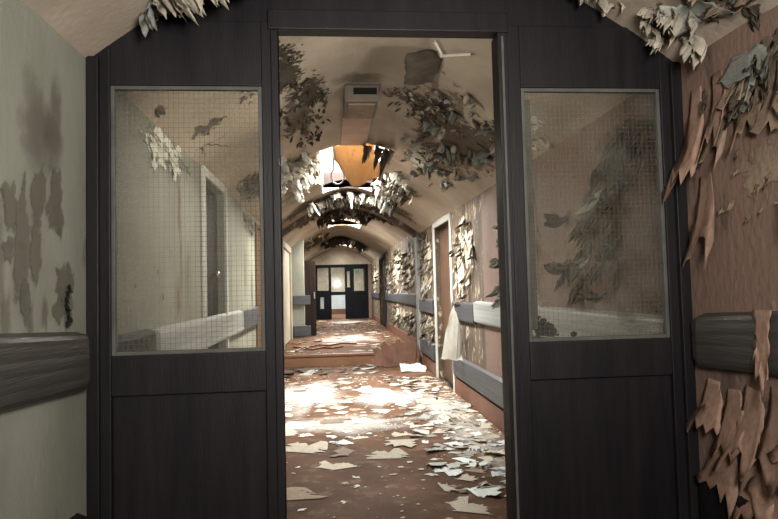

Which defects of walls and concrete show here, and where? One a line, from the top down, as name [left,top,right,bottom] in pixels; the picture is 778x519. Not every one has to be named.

peeling [139,0,230,37]
peeling [140,105,191,181]
peeling [279,39,495,254]
peeling [235,172,260,237]
peeling [543,117,653,308]
peeling [370,234,435,344]
peeling [485,285,500,309]